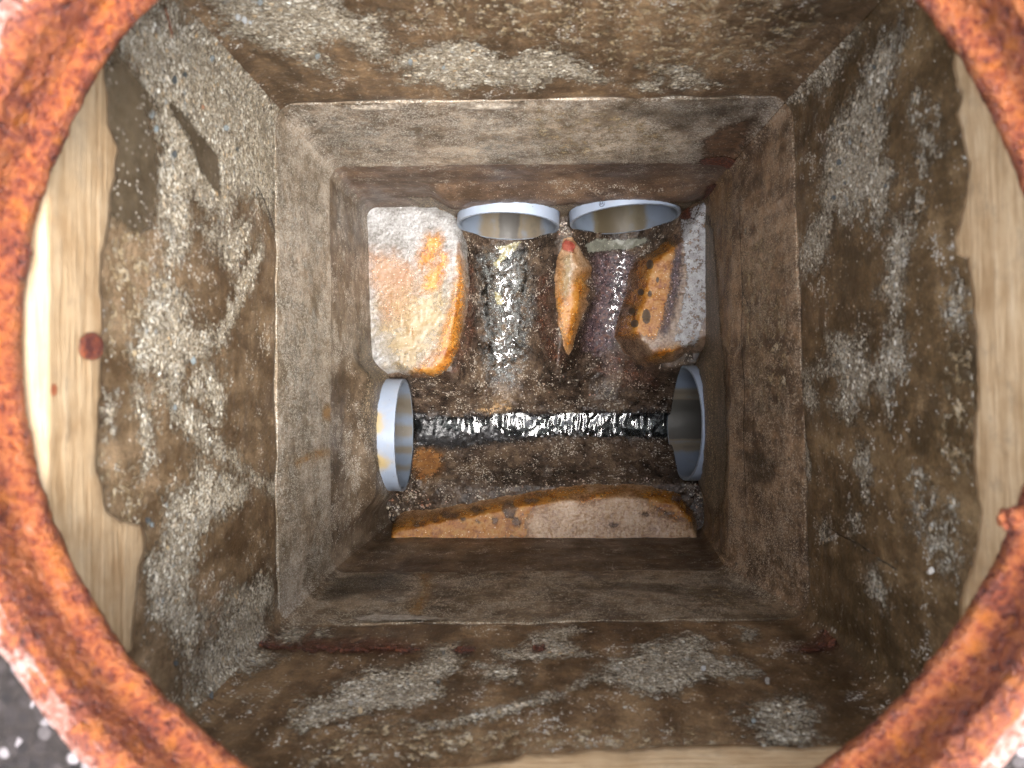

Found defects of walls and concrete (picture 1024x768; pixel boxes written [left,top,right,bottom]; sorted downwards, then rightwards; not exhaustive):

damp [396,0,818,70]
damp [104,56,221,356]
rust [369,234,467,378]
damp [452,248,566,384]
rust [556,272,589,348]
damp [581,251,659,387]
rust [614,240,682,360]
damp [413,400,671,450]
damp [941,351,974,480]
damp [98,449,144,523]
rust [391,484,695,539]
rust [258,629,424,654]